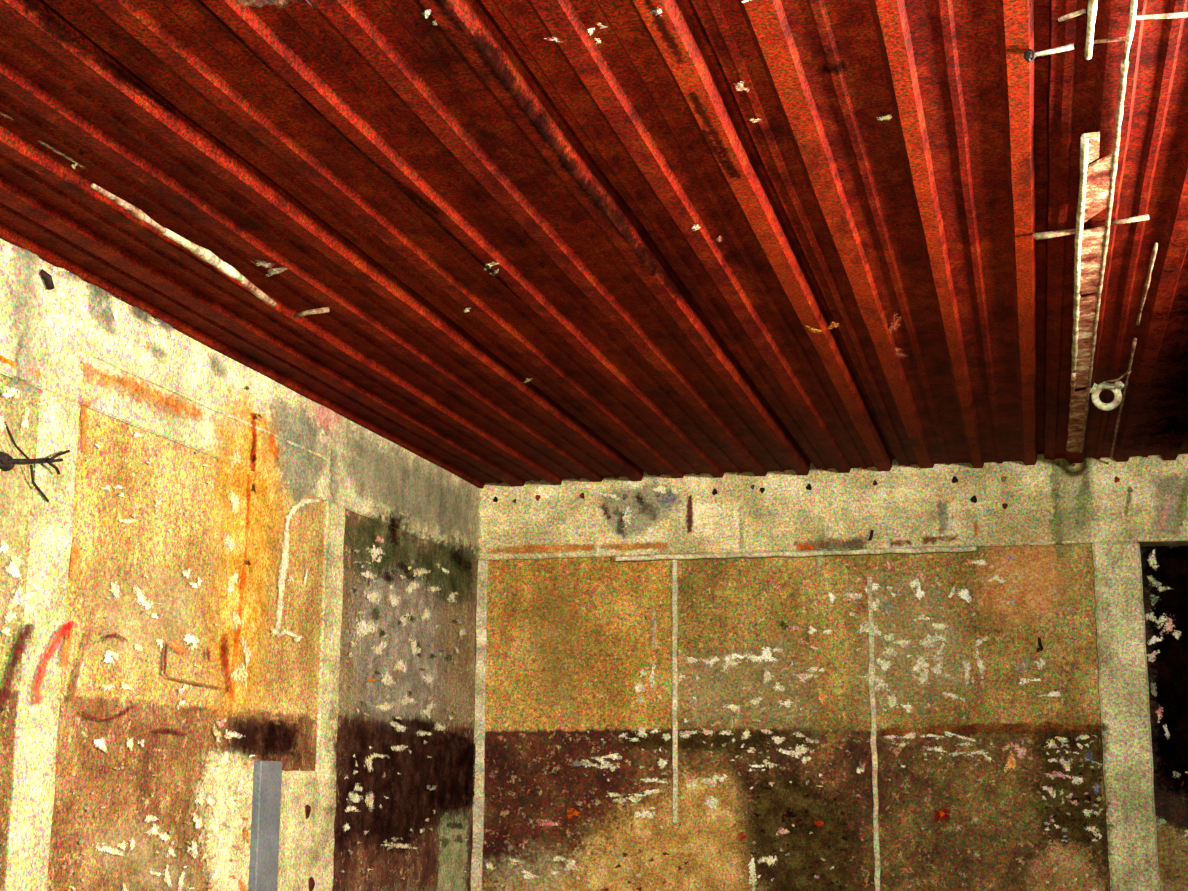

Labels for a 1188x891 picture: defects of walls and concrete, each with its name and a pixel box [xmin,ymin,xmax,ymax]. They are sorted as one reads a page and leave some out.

corrosion [80,361,285,716]
leakage [330,710,476,863]
peeling [347,536,466,731]
flaking render [435,620,832,891]
peeling [828,570,1113,891]